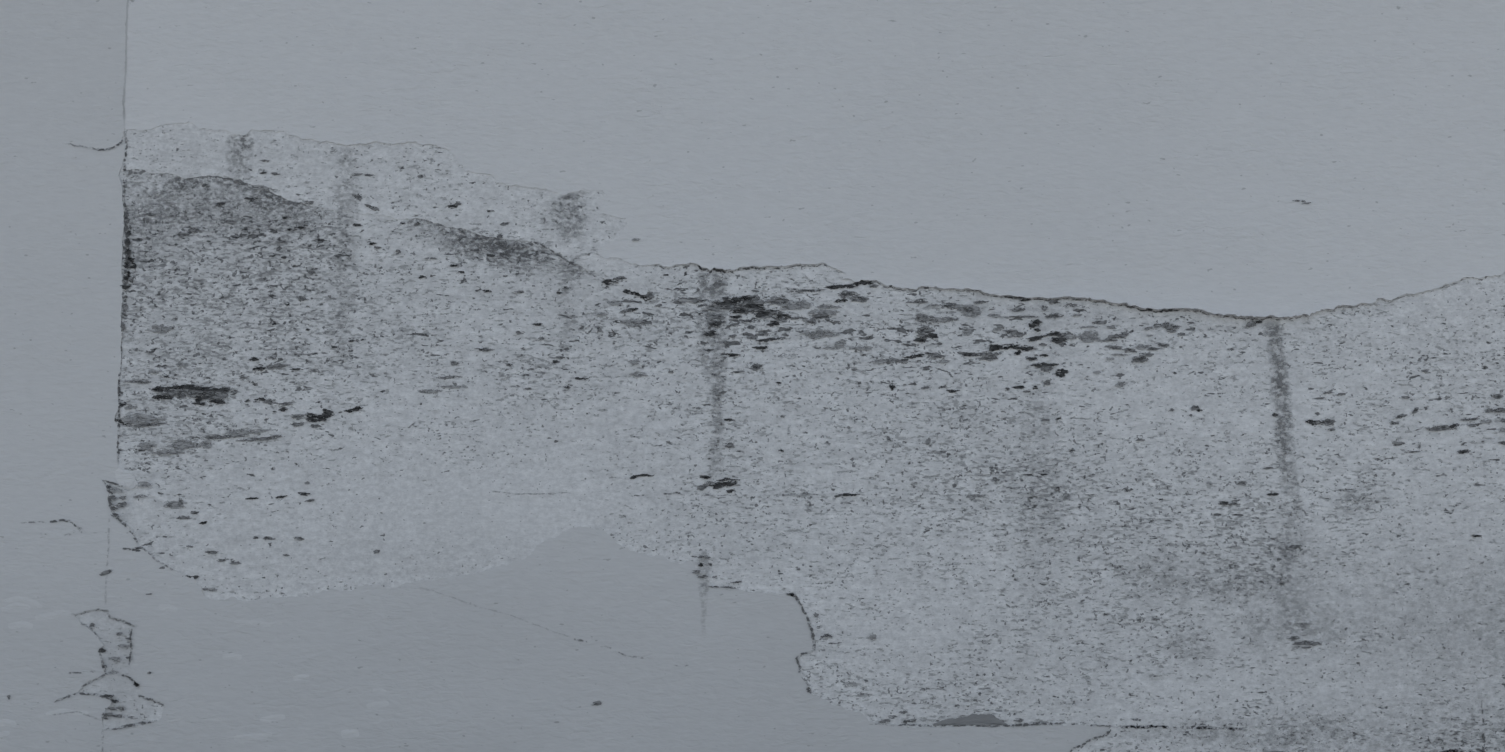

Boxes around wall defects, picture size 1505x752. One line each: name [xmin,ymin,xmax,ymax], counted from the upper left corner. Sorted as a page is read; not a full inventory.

leakage [702,273,724,343]
peeling [102,122,1505,752]
leakage [1266,325,1294,479]
peeling [75,610,165,729]